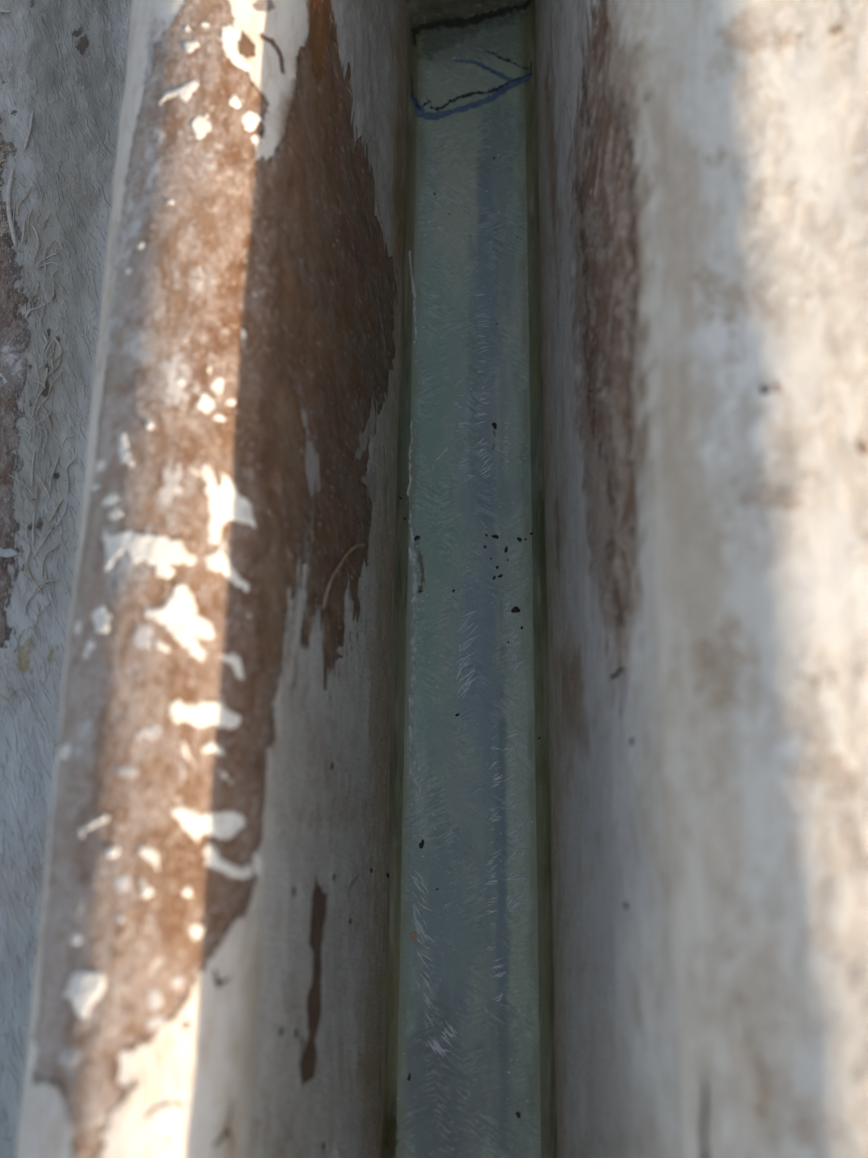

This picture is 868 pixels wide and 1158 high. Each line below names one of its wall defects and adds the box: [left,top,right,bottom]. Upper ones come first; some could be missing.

rust [305,0,335,84]
peeling [0,212,54,648]
peeling [26,0,397,1158]